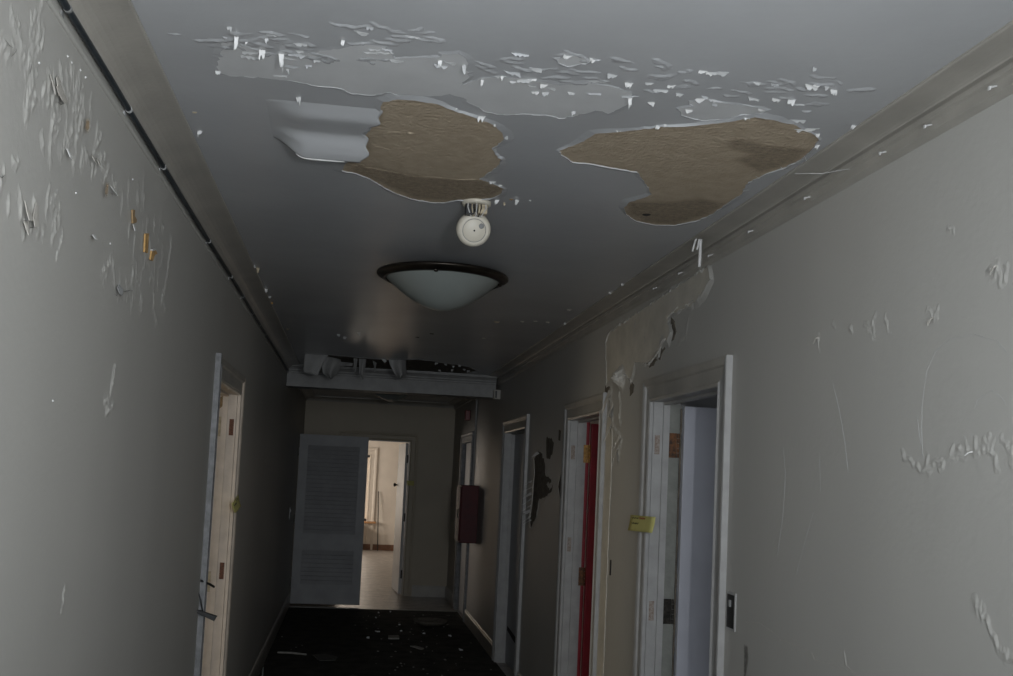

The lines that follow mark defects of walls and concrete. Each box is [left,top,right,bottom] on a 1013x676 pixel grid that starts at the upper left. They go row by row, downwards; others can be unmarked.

peeling [167,21,877,227]
flaking render [300,353,481,380]
peeling [605,239,714,396]